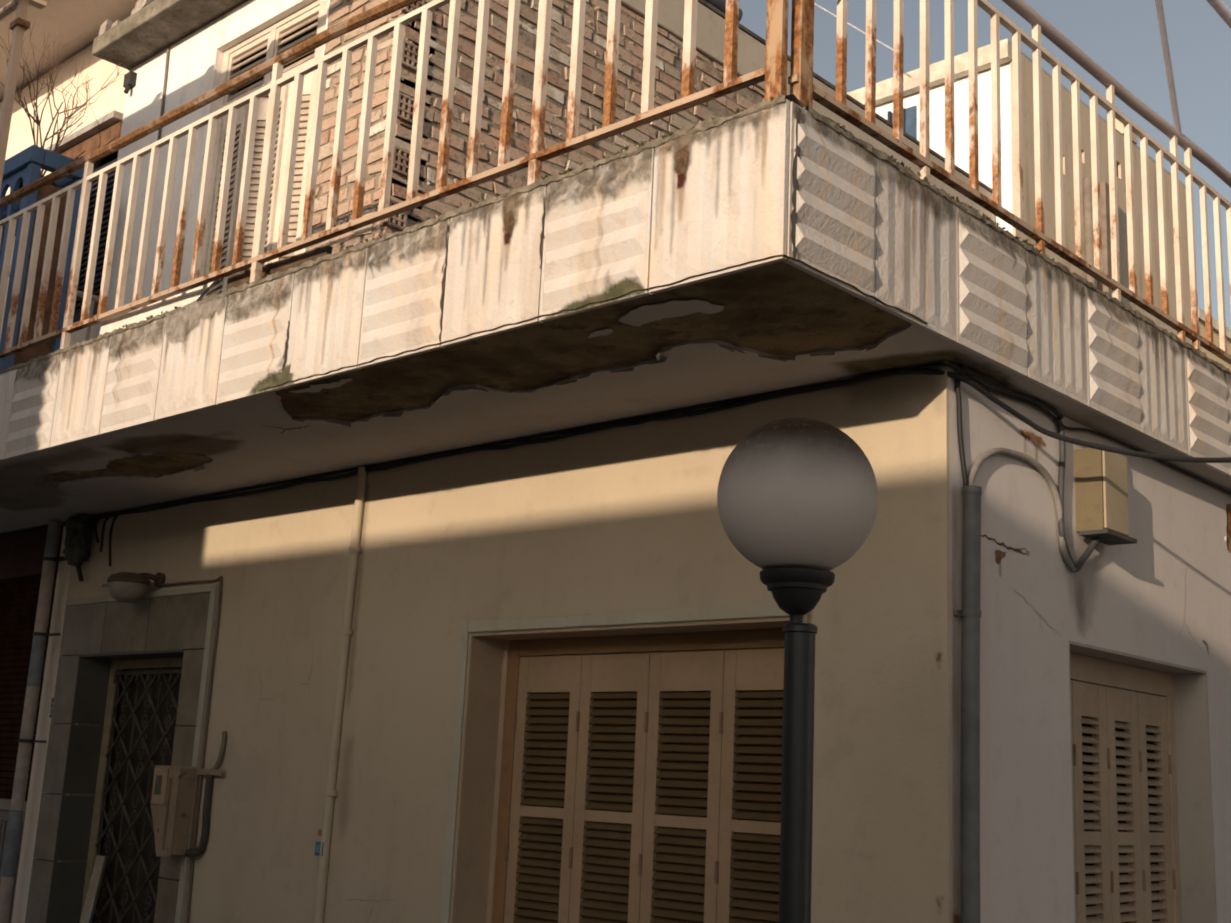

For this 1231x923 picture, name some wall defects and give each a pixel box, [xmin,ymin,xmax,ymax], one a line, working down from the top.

leakage [516,101,842,211]
leakage [207,199,499,321]
leakage [856,143,1231,382]
leakage [545,278,644,319]
leakage [14,313,173,383]
flaking render [261,254,928,427]
leakage [250,365,293,394]
leakage [845,352,1009,386]
leakage [111,435,236,455]
flaking render [35,453,213,487]
crack [981,534,1030,555]